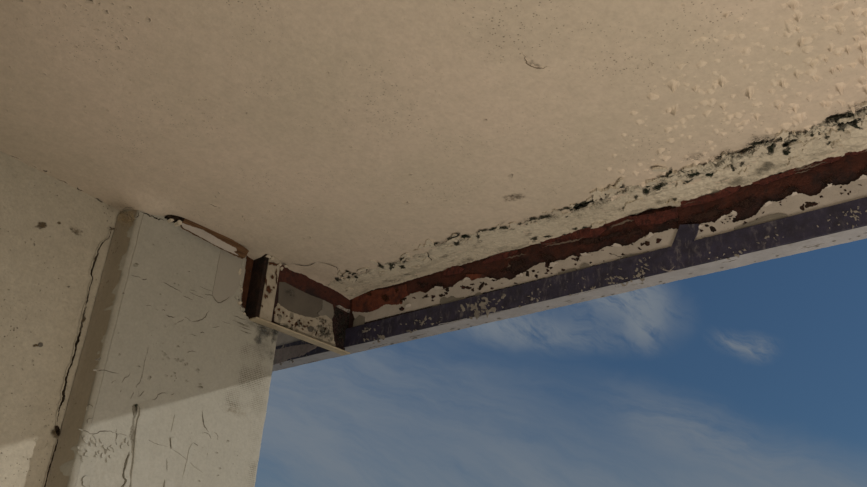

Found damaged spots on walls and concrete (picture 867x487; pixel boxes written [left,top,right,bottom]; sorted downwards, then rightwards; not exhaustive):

crack [134,211,164,221]
spalling [329,102,867,299]
corrosion [540,185,756,263]
corrosion [752,149,867,197]
crack [43,227,174,487]
crack [131,275,232,353]
spalling [235,256,254,314]
peeling [273,331,323,366]
corrosion [274,308,328,335]
corrosion [352,250,526,313]
peeling [352,228,678,349]
crack [149,412,218,473]